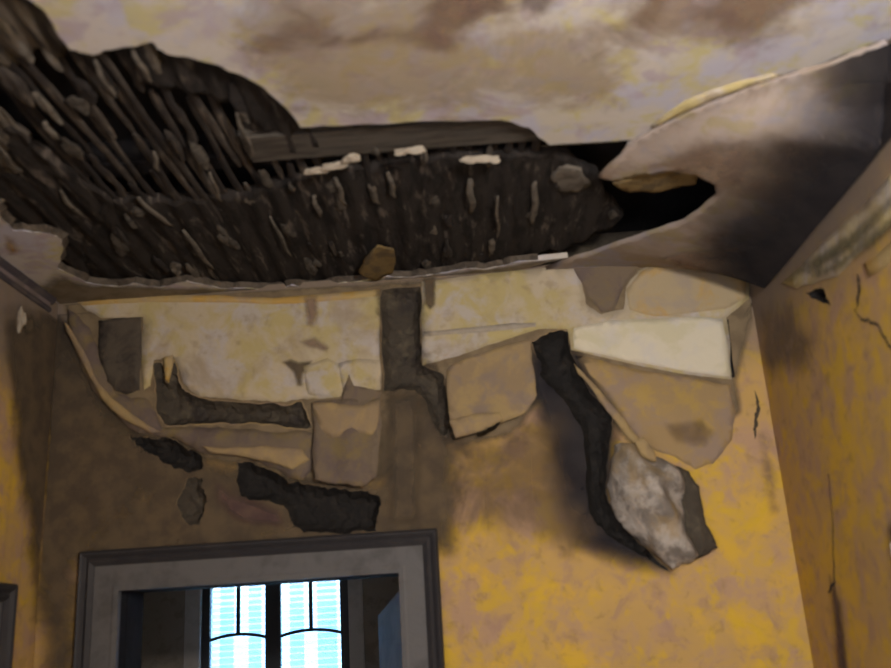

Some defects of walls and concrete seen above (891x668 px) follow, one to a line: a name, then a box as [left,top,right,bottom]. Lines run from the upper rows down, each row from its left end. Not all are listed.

water stain [635,0,793,37]
crack [854,274,891,348]
peeling [0,198,752,572]